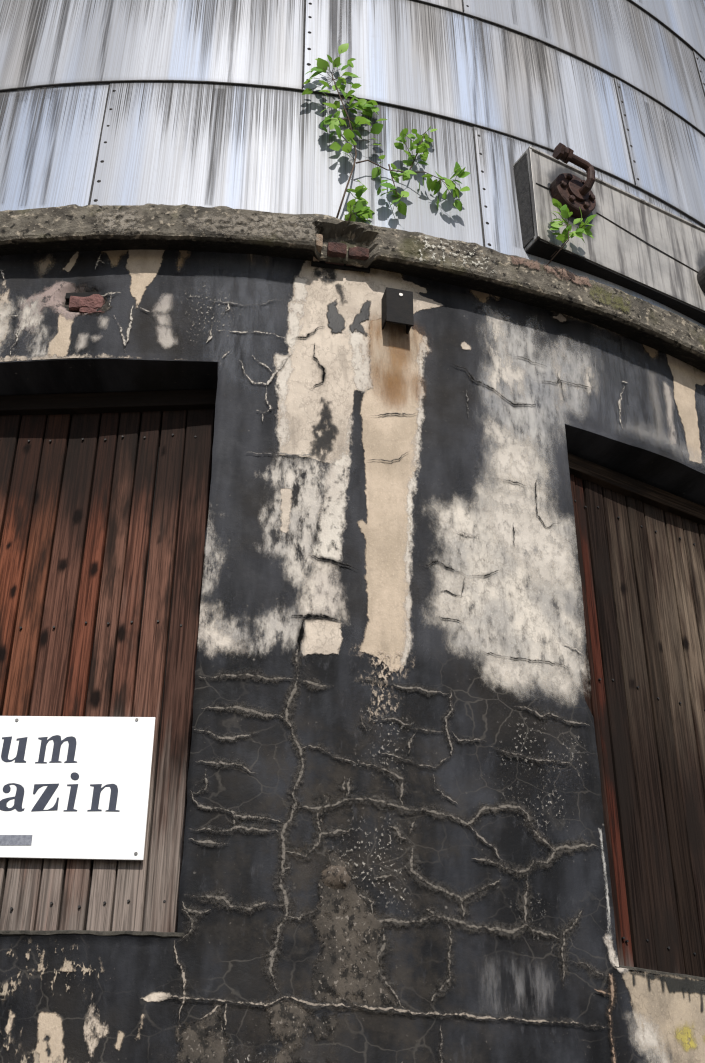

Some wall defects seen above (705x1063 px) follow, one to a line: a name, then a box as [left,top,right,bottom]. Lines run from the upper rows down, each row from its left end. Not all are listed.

peeling [0,252,138,362]
peeling [102,250,165,308]
crack [207,299,326,421]
peeling [642,344,705,463]
peeling [432,290,598,701]
crack [160,613,616,1063]
peeling [3,1011,67,1063]
peeling [0,945,103,995]
peeling [83,994,124,1057]
peeling [143,992,171,1002]
spalling [266,849,409,1063]
peeling [622,971,705,1063]